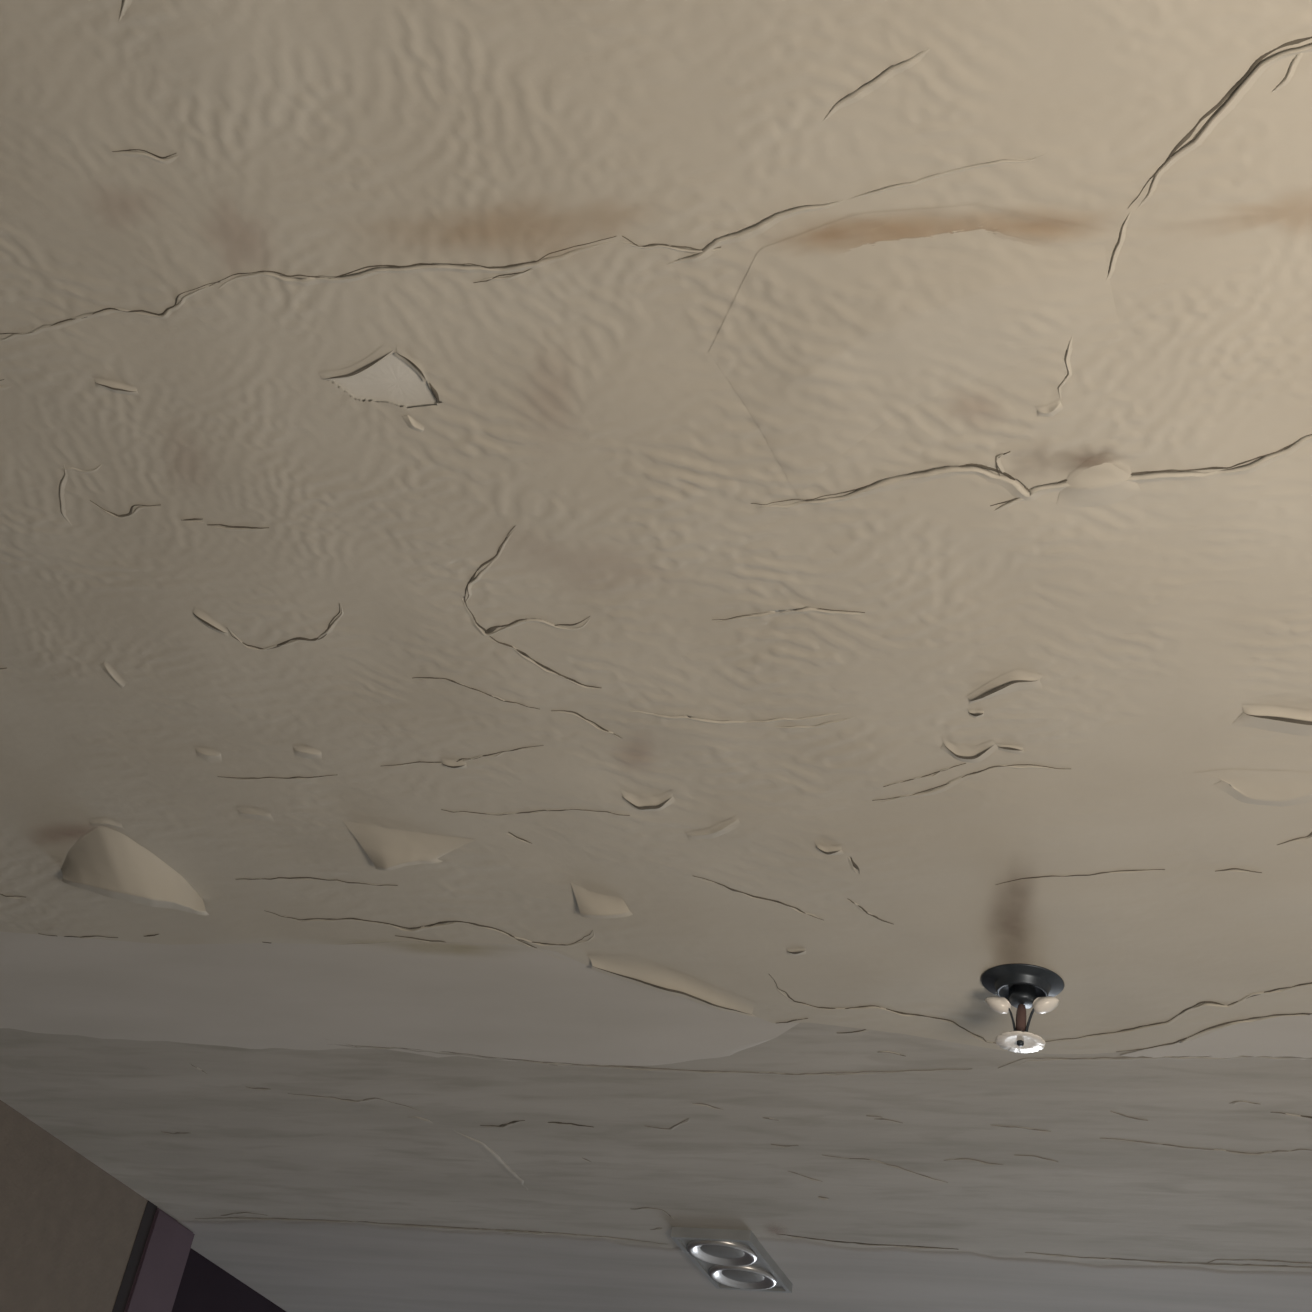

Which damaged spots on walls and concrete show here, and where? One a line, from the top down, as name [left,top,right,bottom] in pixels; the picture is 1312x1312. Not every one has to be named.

crack [823,48,930,121]
crack [1106,36,1312,280]
crack [0,152,1050,341]
flaking render [318,344,442,408]
crack [1058,335,1073,401]
flaking render [402,414,425,433]
crack [58,464,269,531]
crack [751,451,1070,511]
crack [1126,434,1312,484]
crack [415,526,621,739]
crack [441,809,630,845]
crack [336,974,1312,1130]